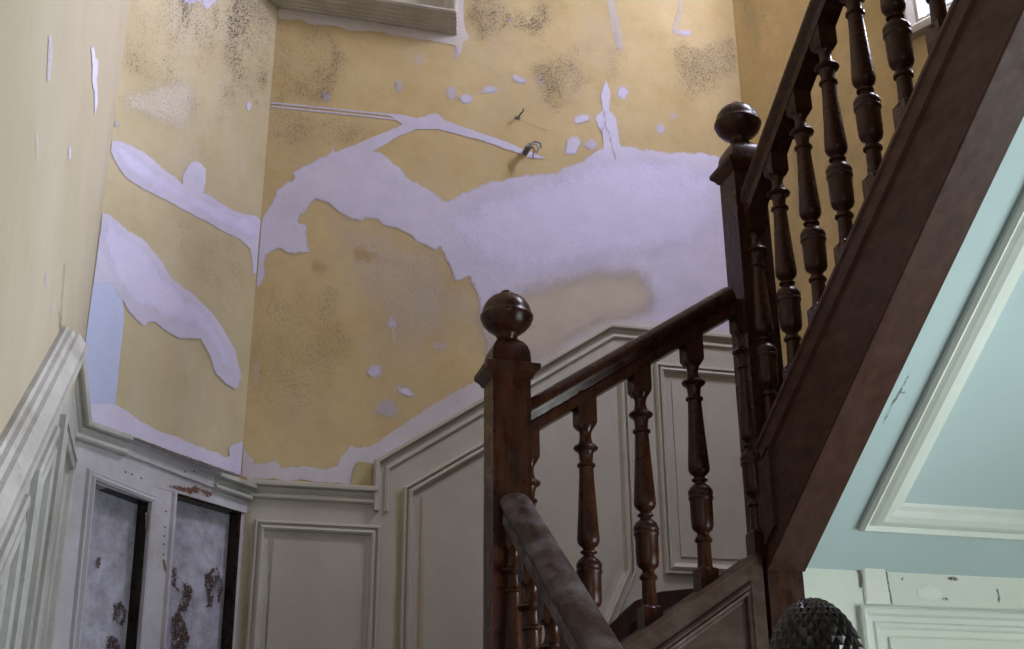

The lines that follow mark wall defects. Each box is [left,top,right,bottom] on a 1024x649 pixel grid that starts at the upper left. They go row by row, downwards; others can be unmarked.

damp [124,0,374,149]
damp [528,0,627,115]
peeling [469,294,496,394]
peeling [517,257,665,362]
rust [167,485,211,497]